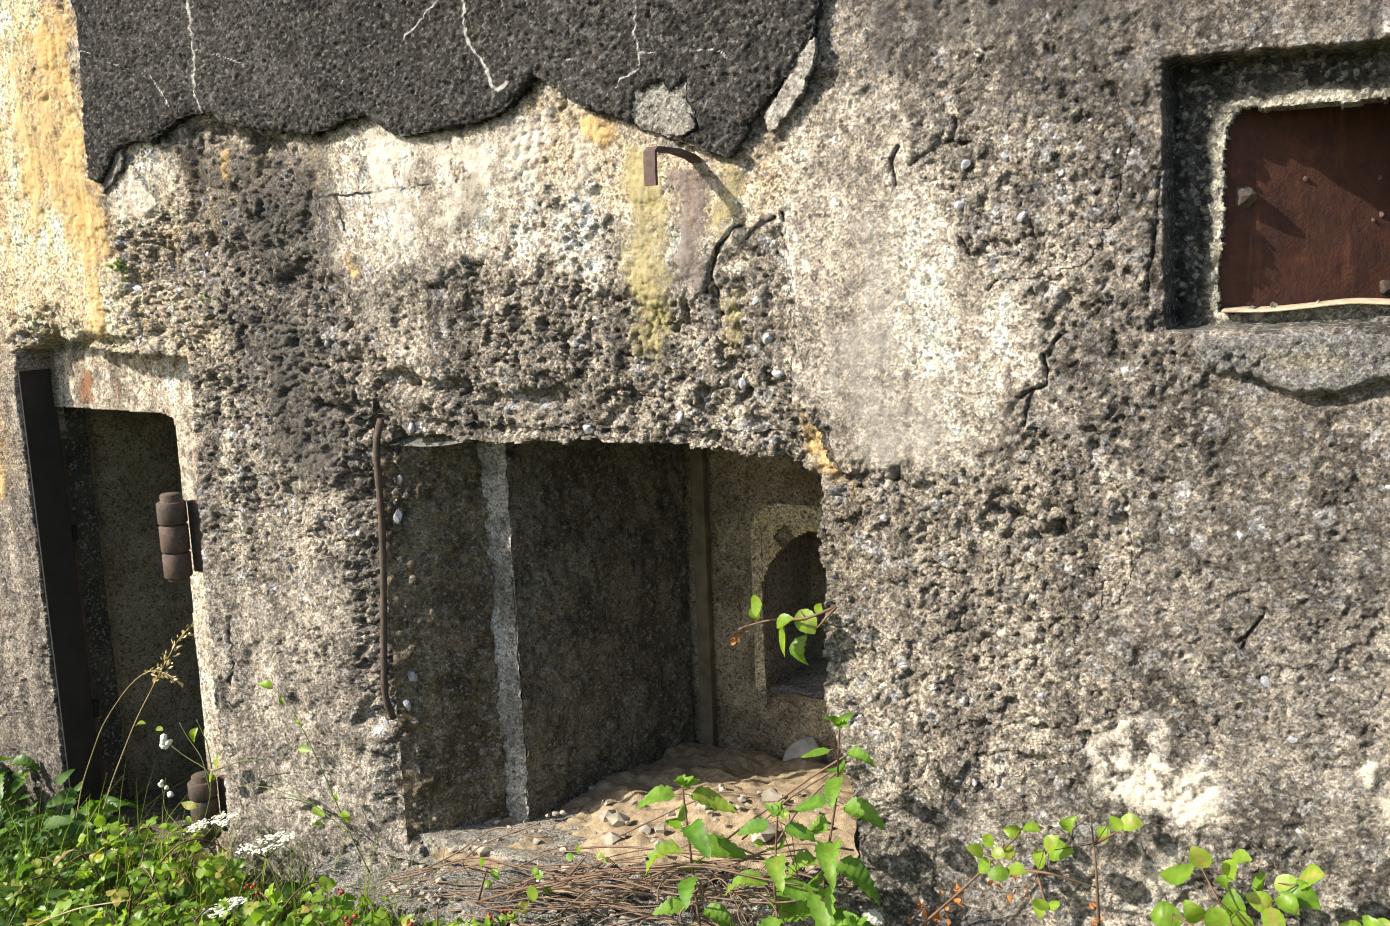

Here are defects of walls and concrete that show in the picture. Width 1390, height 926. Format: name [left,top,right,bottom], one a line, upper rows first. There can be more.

crack [150,0,241,112]
crack [404,0,509,91]
crack [615,7,727,88]
spalling [912,50,1136,284]
corrosion [579,114,741,354]
spalling [21,106,1233,849]
peeling [1142,852,1180,896]